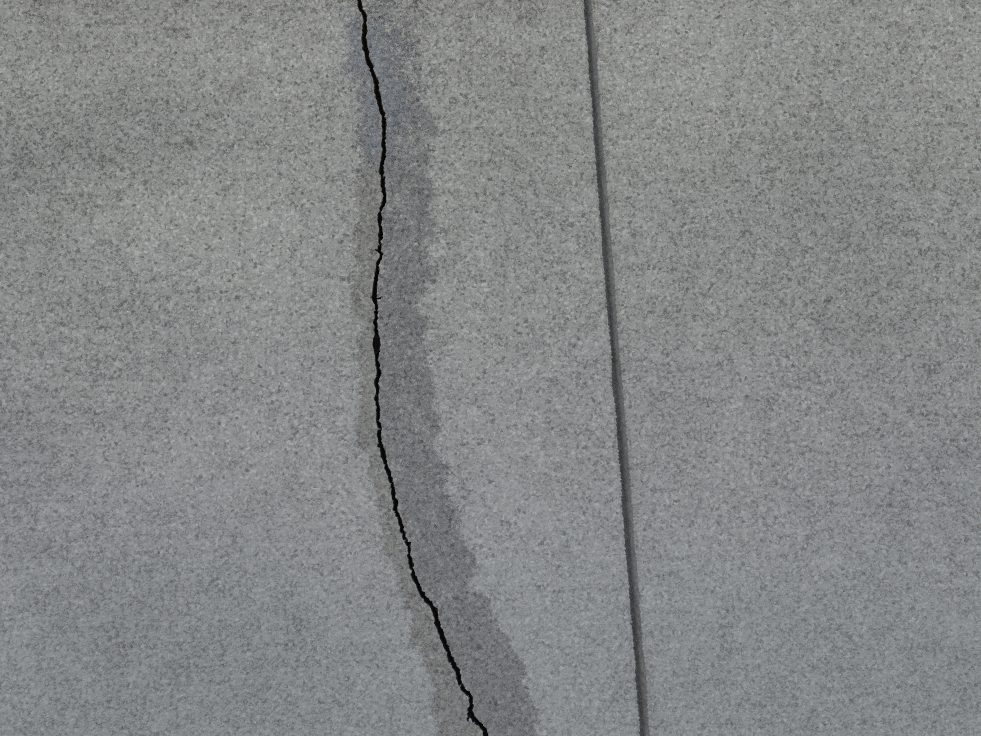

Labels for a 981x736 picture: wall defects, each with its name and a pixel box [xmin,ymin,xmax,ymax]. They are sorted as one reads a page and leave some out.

crack [358,0,488,736]
leakage [344,0,539,736]